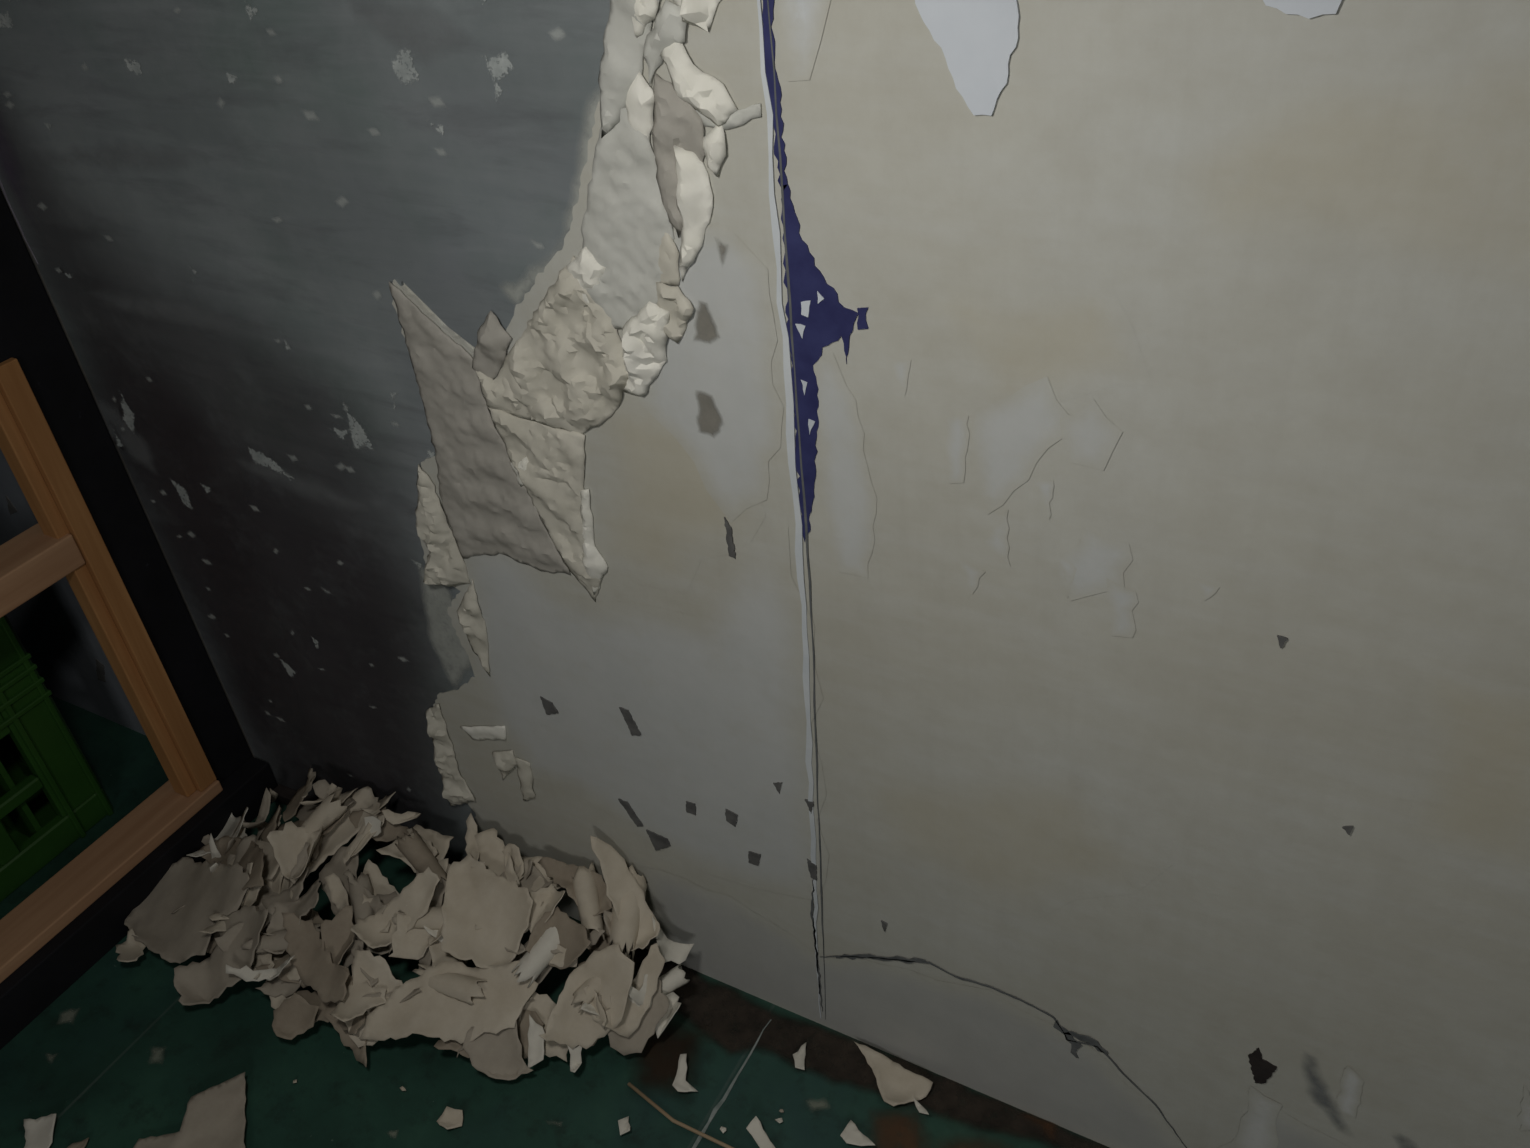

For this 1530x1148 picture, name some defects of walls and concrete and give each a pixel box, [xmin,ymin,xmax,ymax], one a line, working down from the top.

peeling [915,0,1020,116]
peeling [1263,0,1342,19]
peeling [0,0,762,862]
crack [757,0,1187,1148]
spalling [748,851,761,866]
spalling [807,858,818,881]